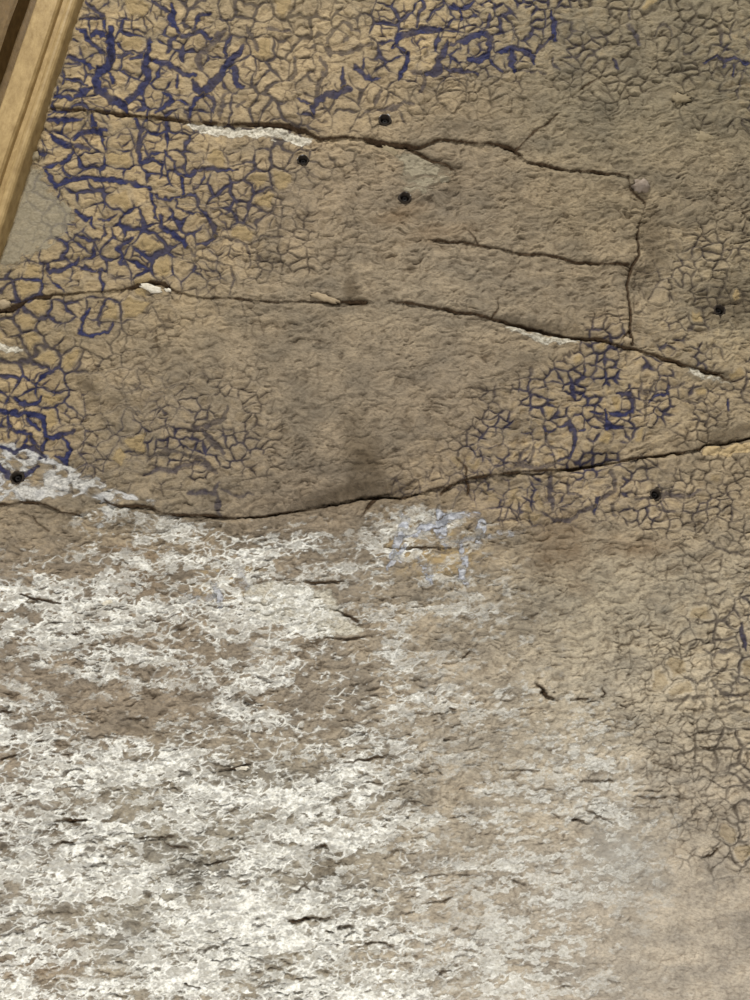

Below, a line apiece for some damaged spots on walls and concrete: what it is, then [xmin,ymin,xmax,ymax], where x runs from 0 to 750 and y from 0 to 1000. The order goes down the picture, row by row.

spalling [187,124,312,147]
crack [0,107,732,382]
peeling [139,283,171,294]
crack [0,501,82,532]
crack [104,437,750,519]
leakage [0,508,636,1000]